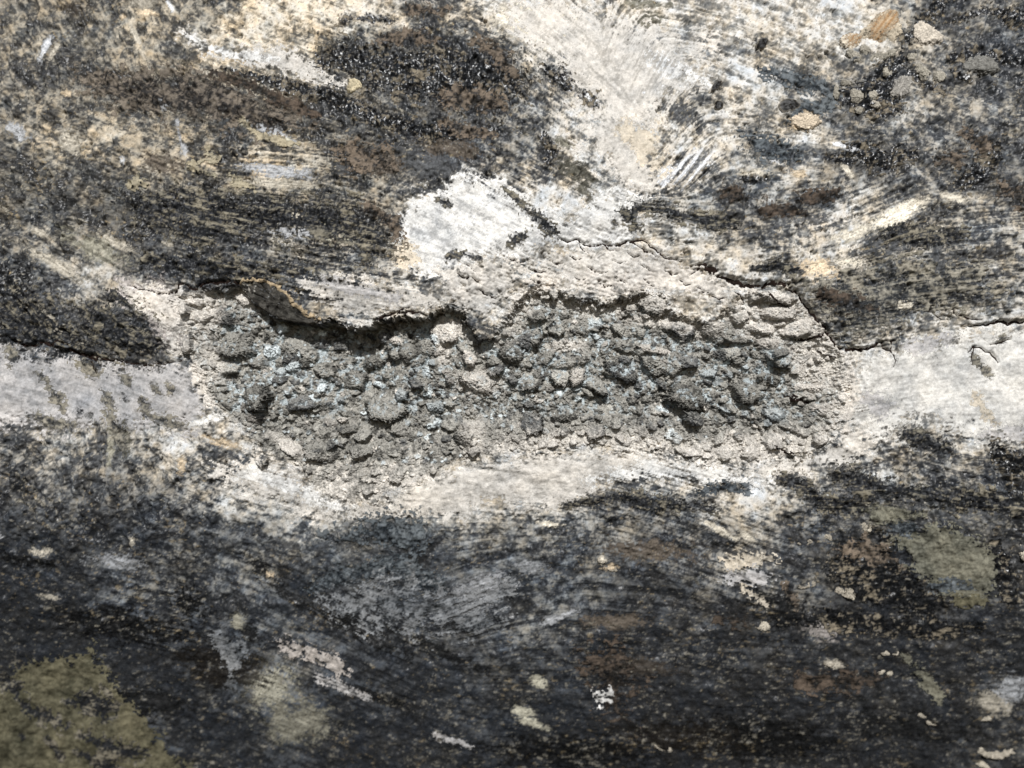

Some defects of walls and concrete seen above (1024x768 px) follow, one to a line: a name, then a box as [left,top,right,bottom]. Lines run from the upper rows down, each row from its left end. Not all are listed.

damp [754,0,1024,126]
damp [822,134,926,177]
damp [951,136,1013,197]
damp [0,0,808,456]
damp [877,219,972,254]
crack [510,238,896,367]
damp [816,286,882,320]
spalling [167,277,854,512]
damp [200,311,1024,656]
damp [207,629,250,679]
damp [313,673,372,702]
damp [592,685,615,709]